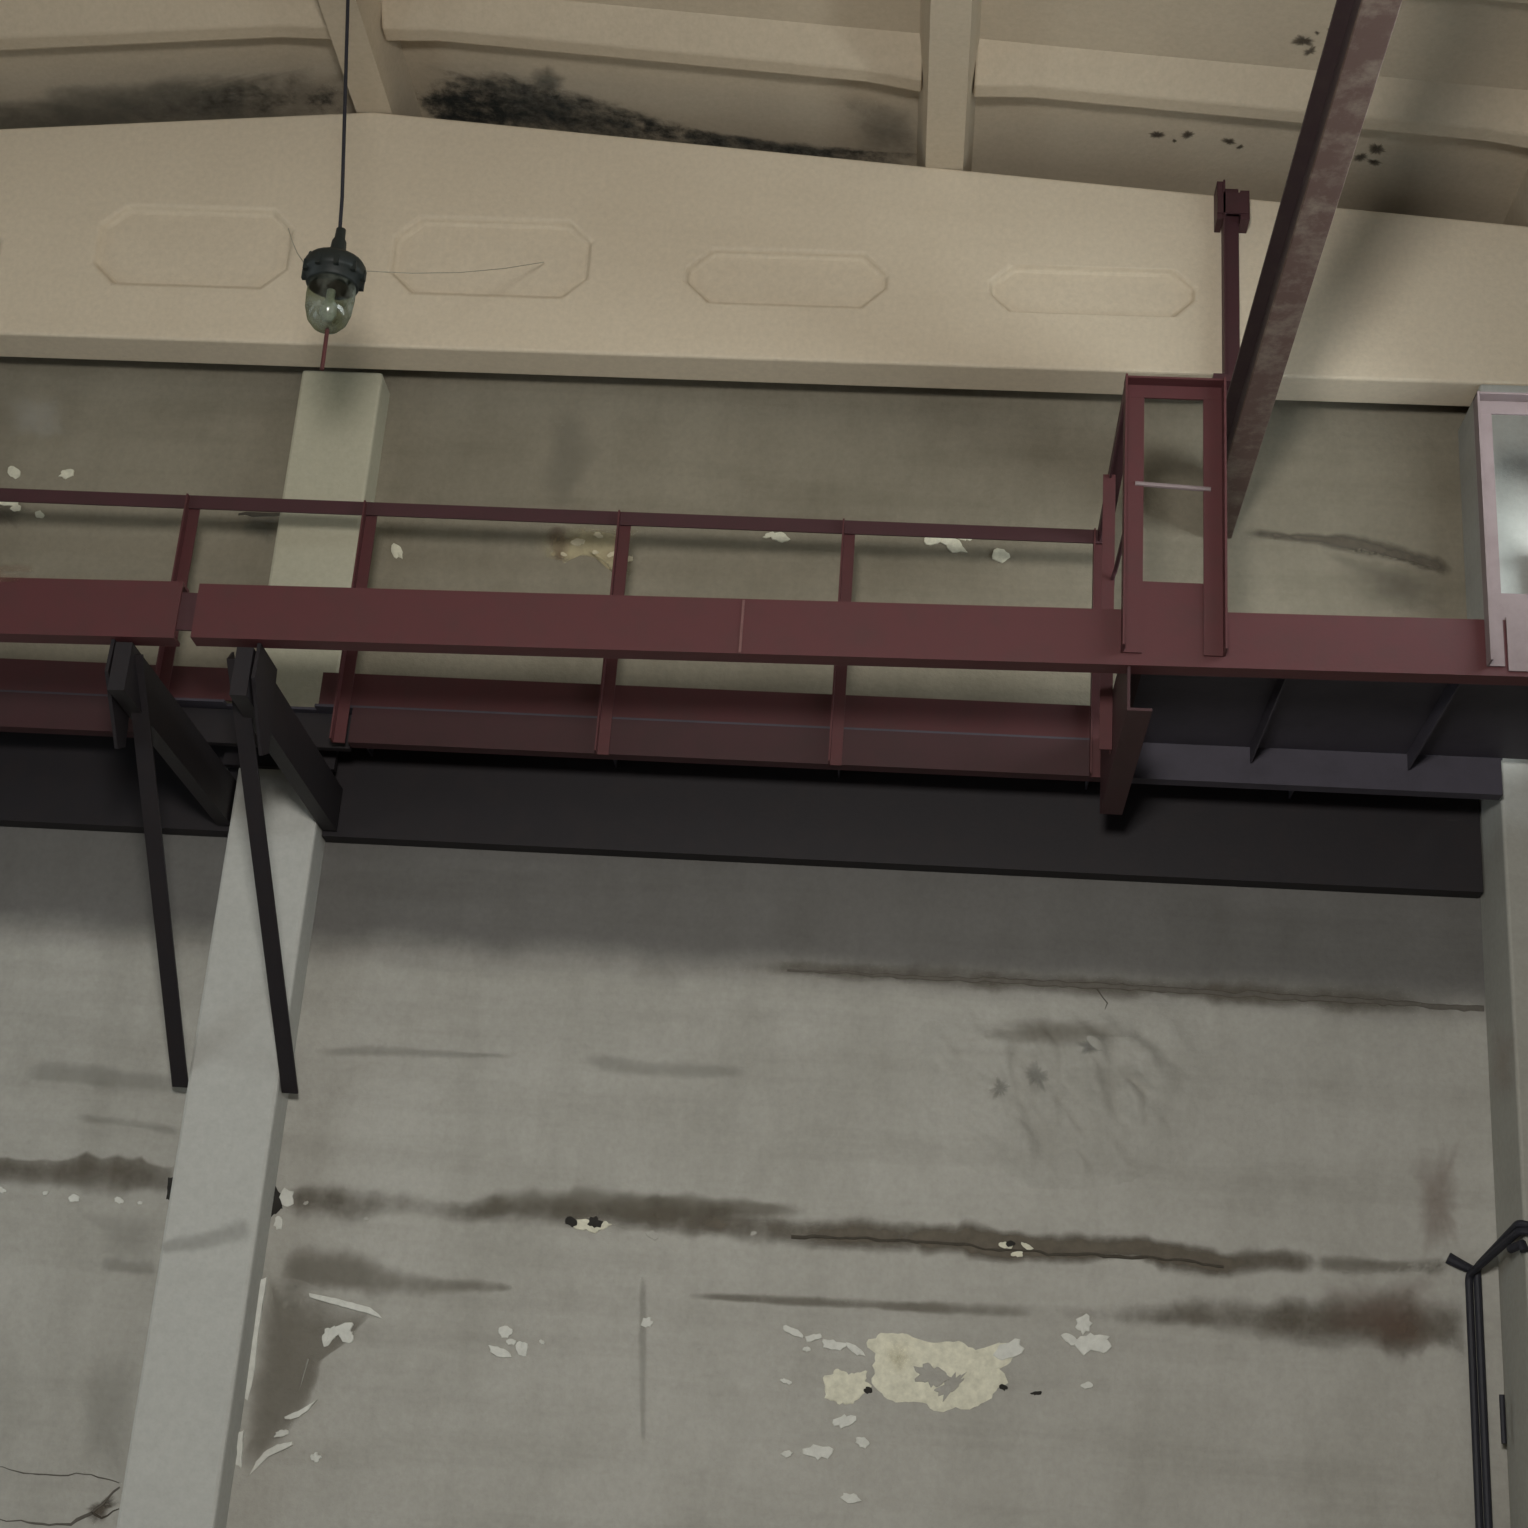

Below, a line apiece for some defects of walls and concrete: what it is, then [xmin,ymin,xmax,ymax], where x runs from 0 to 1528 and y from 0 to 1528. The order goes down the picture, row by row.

leakage [34,91,233,127]
leakage [427,78,863,159]
peeling [924,537,972,553]
leakage [0,1154,158,1205]
leakage [553,1203,1305,1274]
peeling [245,1277,268,1400]
peeling [309,1293,382,1347]
peeling [1061,1313,1112,1356]
leakage [1232,1304,1455,1347]
peeling [783,1325,1025,1448]
peeling [236,1400,317,1476]
crack [0,1466,120,1526]